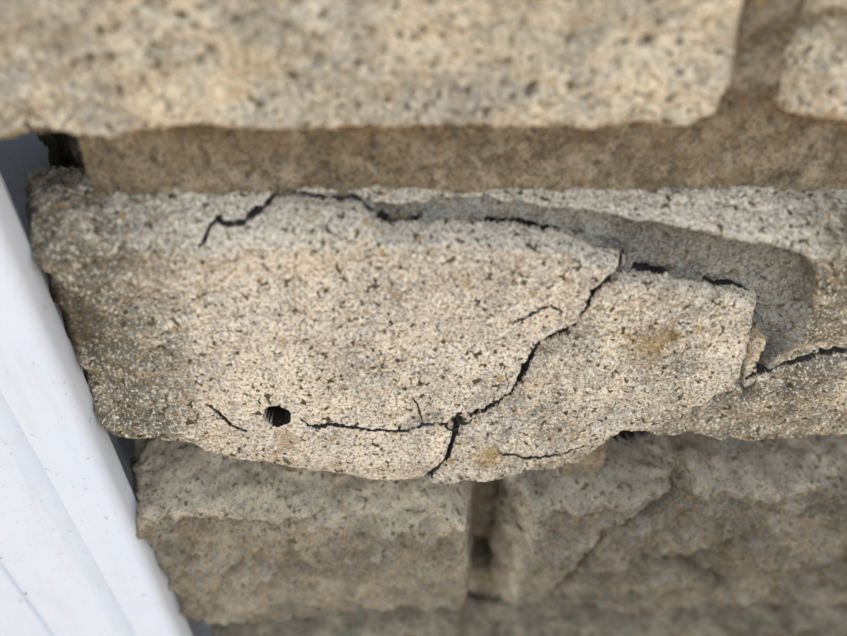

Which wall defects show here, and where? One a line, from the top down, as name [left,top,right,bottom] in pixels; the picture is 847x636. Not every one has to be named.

crack [198,191,373,248]
crack [206,404,247,432]
crack [301,247,625,478]
spalling [184,191,818,484]